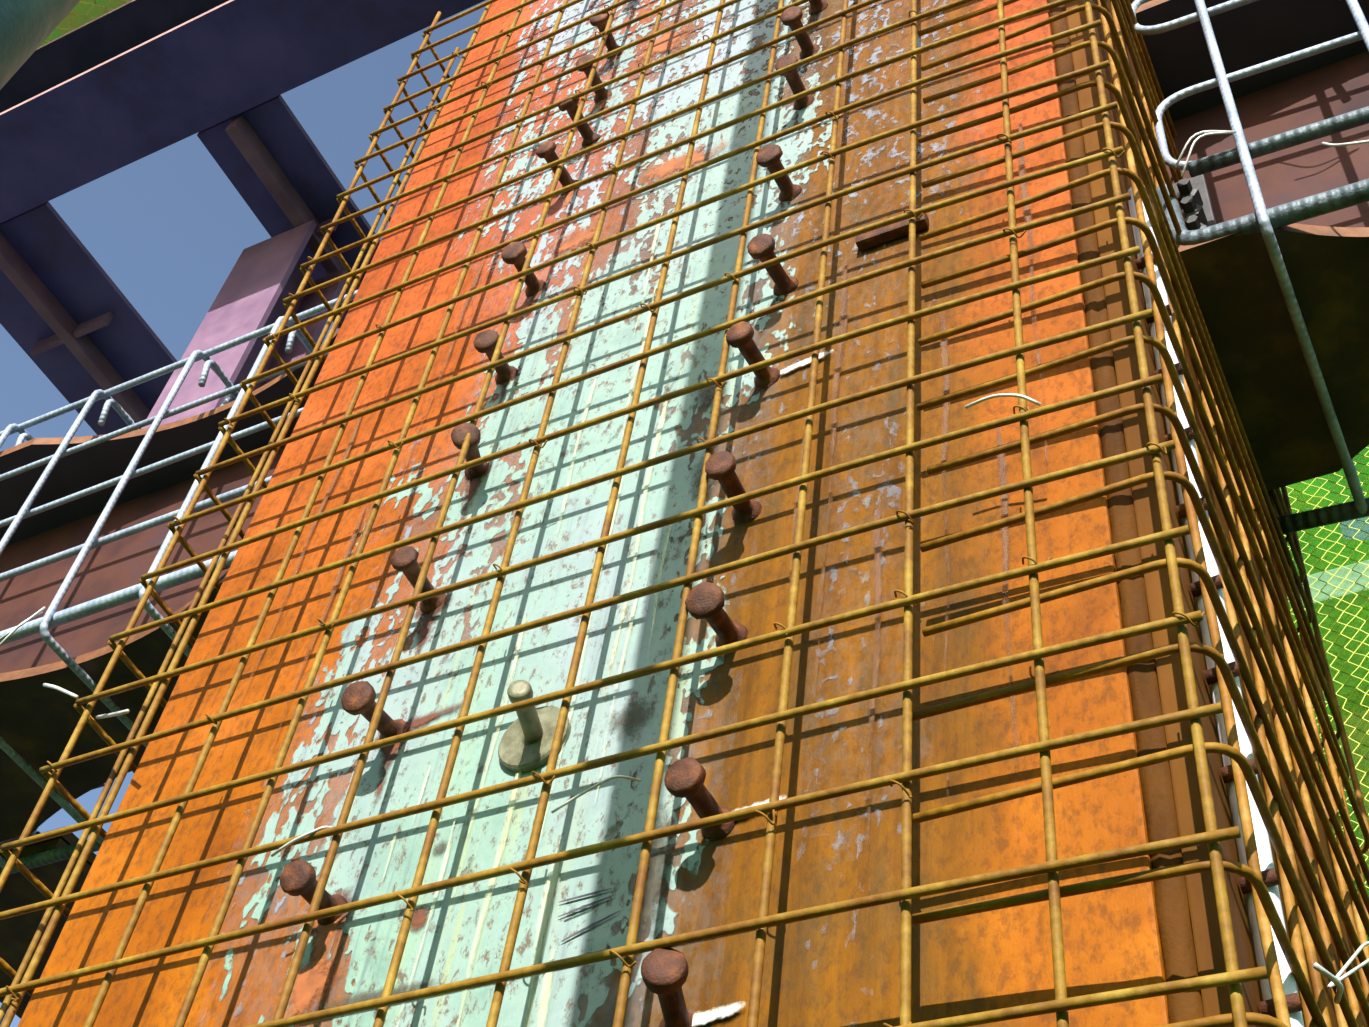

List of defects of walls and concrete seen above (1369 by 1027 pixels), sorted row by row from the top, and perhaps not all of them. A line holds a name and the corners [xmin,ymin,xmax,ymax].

rust [641,143,723,183]
rust [1018,122,1034,315]
rust [941,318,949,463]
rust [461,463,490,521]
peeling [239,0,953,1027]
rust [997,429,1008,617]
rust [416,595,450,653]
rust [871,504,882,720]
rust [376,703,462,796]
peeling [220,947,233,1000]
rust [284,892,352,1018]
rust [410,906,427,930]